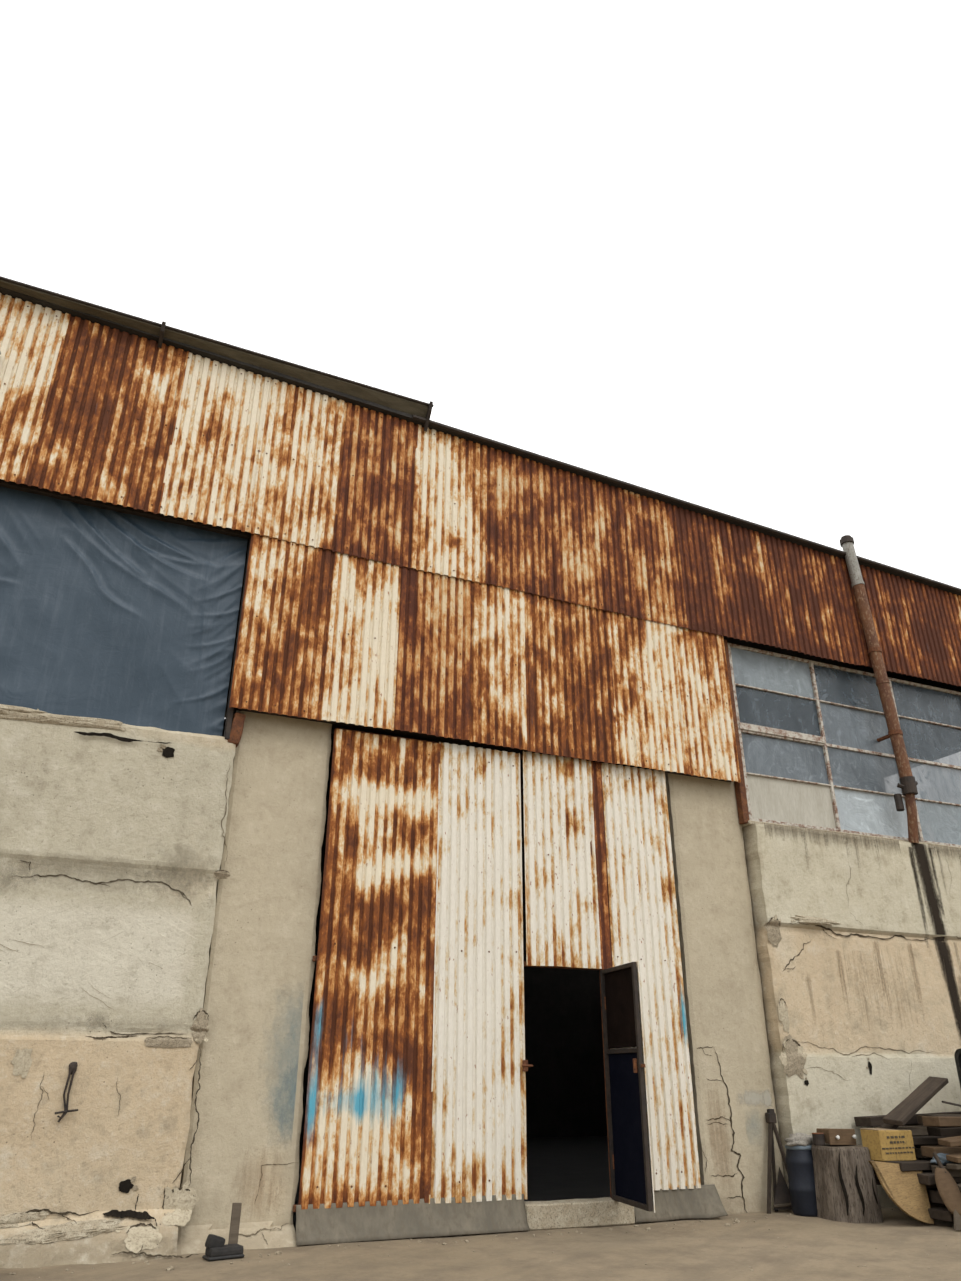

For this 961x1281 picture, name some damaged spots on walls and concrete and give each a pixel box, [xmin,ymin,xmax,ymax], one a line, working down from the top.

spalling [0,704,126,731]
crack [12,860,191,905]
crack [782,852,961,972]
spalling [778,998,808,1080]
crack [804,1042,949,1089]
crack [12,983,201,1258]
crack [697,1046,747,1212]
spalling [0,1181,200,1257]